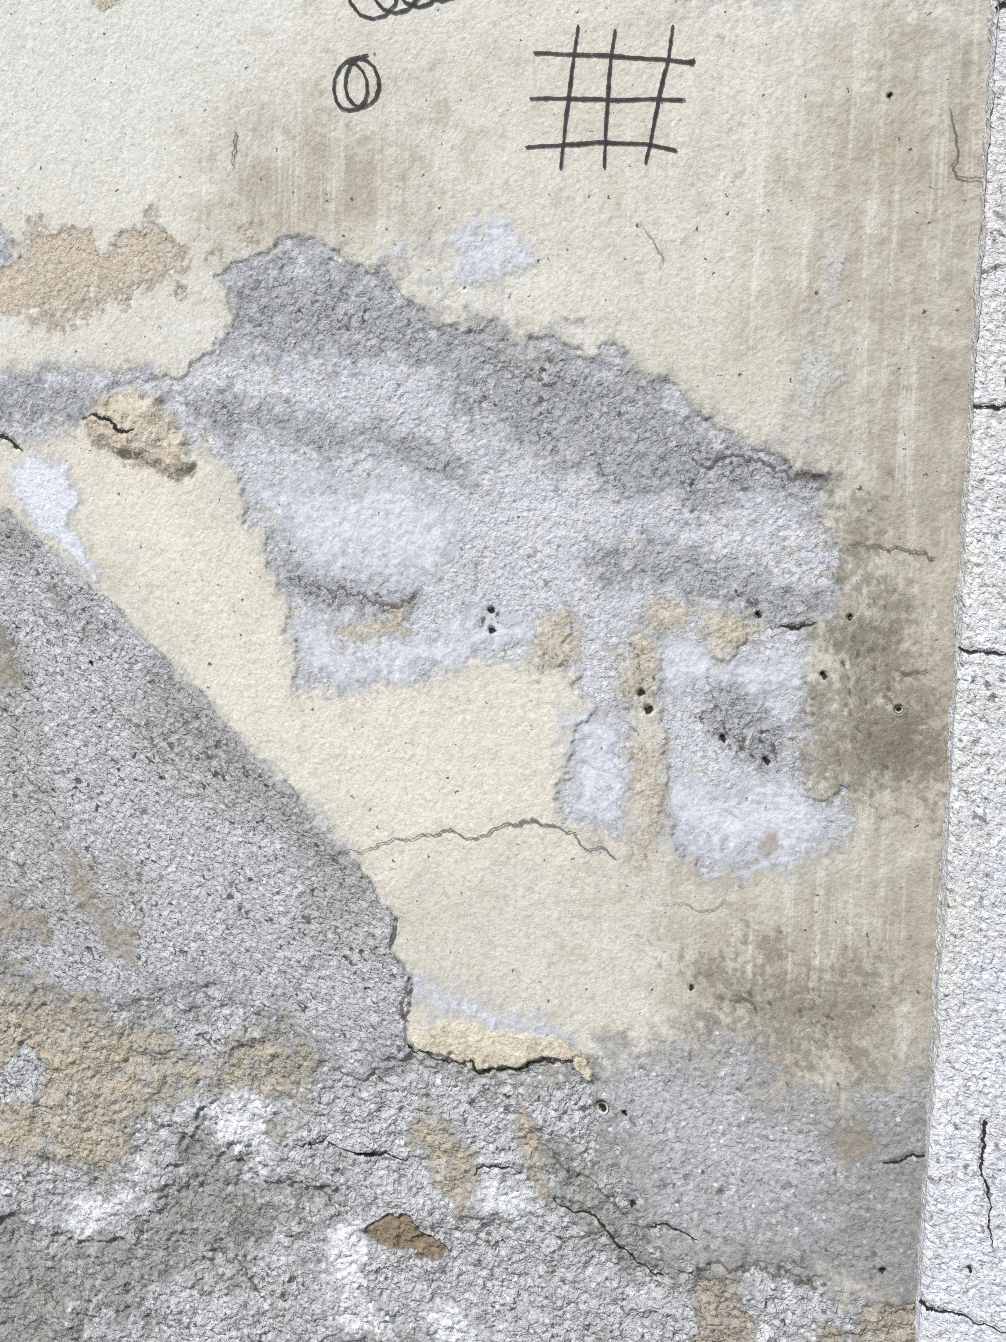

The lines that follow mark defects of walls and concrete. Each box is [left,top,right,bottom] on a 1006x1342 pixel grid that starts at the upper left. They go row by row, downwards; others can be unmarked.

crack [972,403,1006,411]
peeling [0,199,861,887]
damp [327,600,416,659]
damp [525,607,585,682]
damp [618,594,767,706]
damp [826,570,927,774]
crack [315,817,616,859]
damp [613,736,672,876]
crack [979,1120,993,1247]
crack [919,1299,1006,1333]